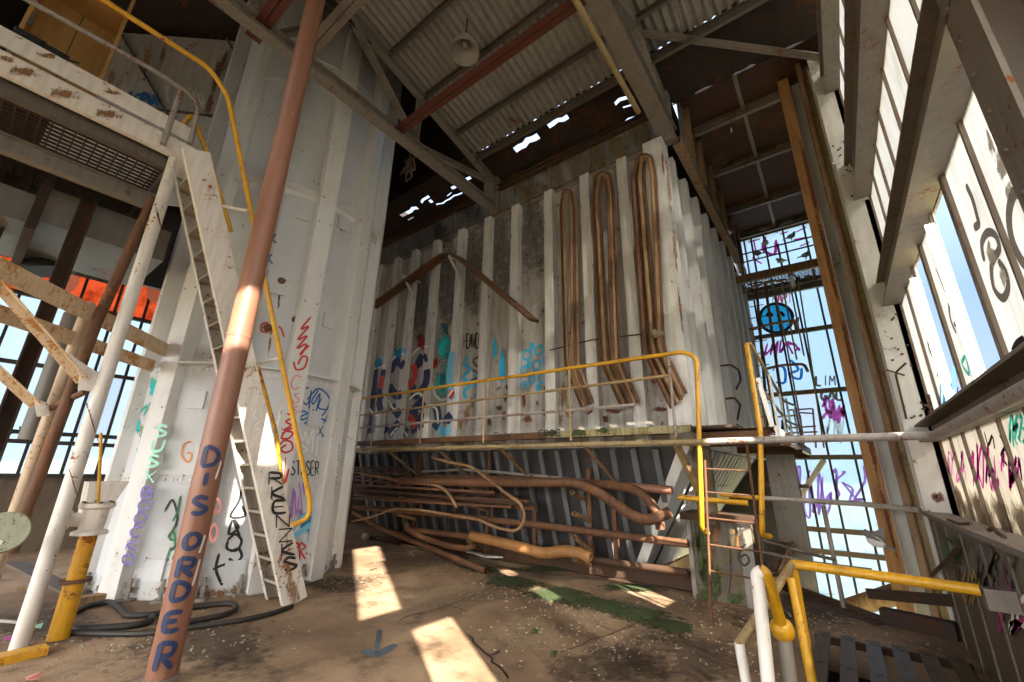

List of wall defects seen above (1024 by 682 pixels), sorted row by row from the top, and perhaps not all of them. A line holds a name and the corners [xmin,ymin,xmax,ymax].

rust [0,56,36,76]
rust [51,88,78,99]
rust [97,110,123,118]
rust [799,141,898,558]
rust [285,562,300,605]